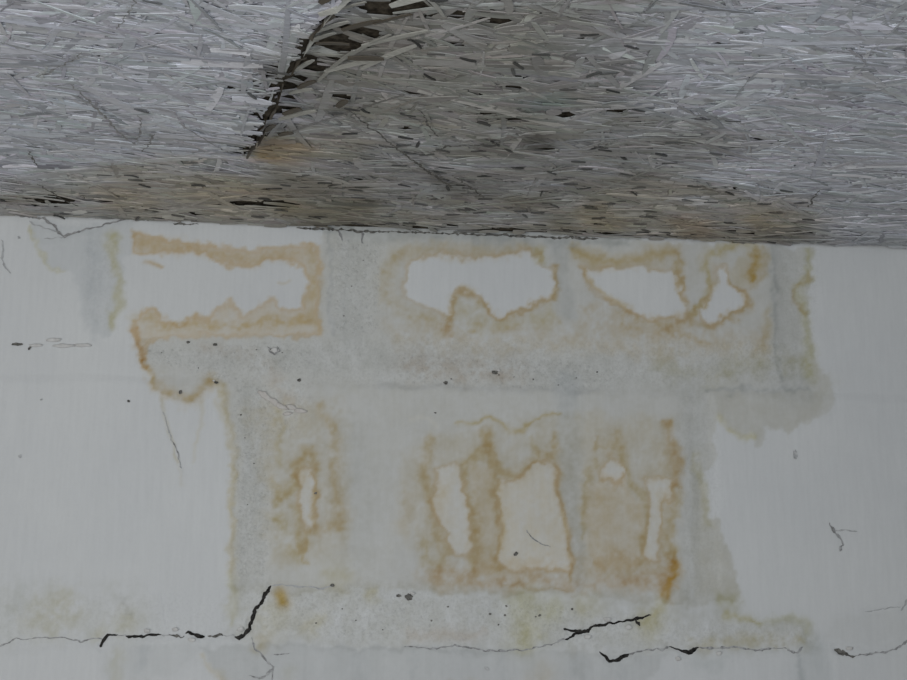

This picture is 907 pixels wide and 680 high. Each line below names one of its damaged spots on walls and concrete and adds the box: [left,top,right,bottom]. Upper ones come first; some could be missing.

leakage [0,0,778,228]
leakage [0,164,907,680]
crack [0,584,332,680]
crack [404,614,803,663]
crack [834,640,907,658]